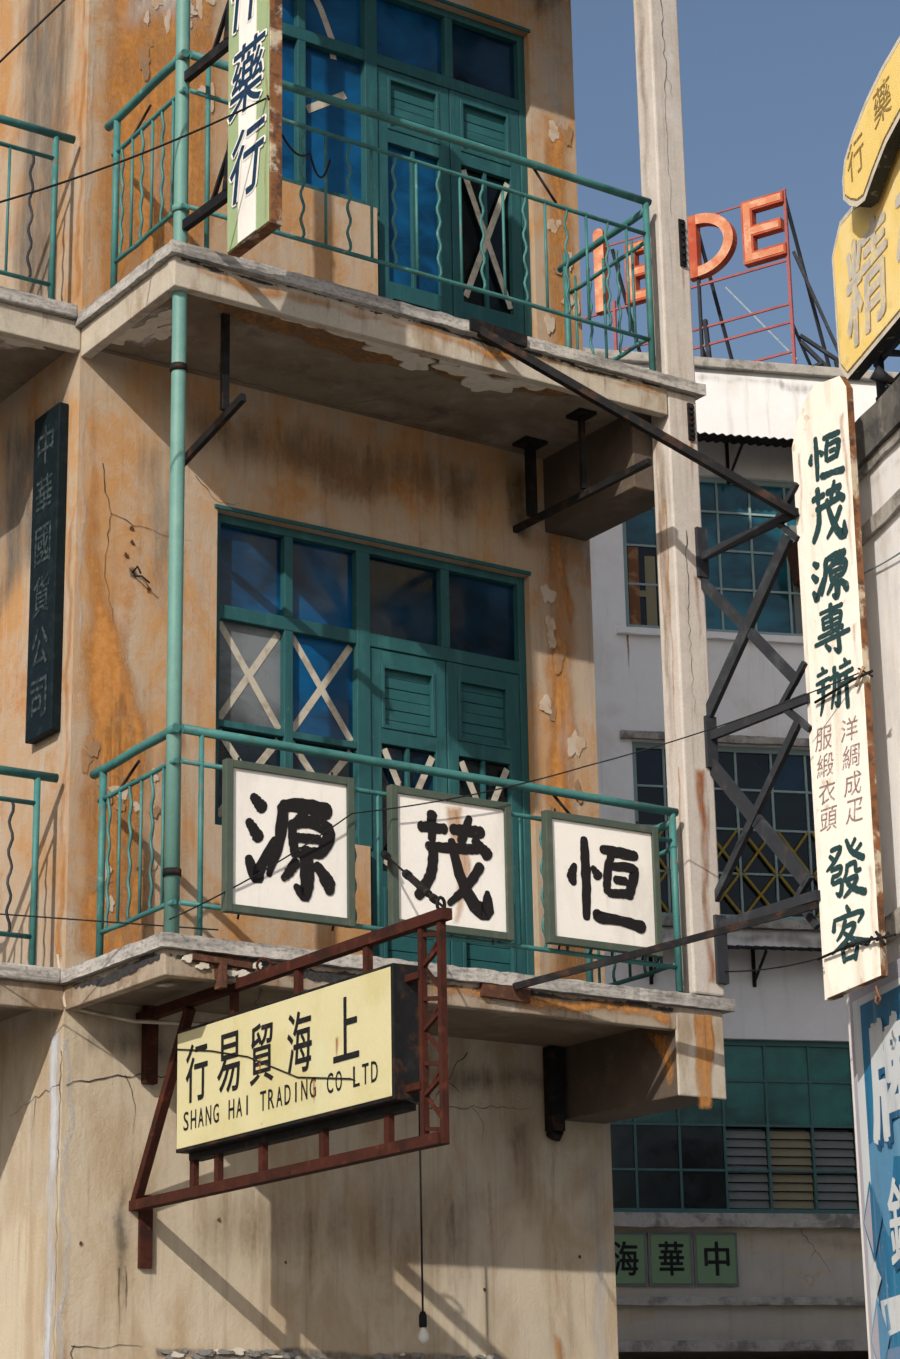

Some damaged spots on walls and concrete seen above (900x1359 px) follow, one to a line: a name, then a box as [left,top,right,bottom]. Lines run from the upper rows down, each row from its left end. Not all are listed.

peeling [136,0,215,81]
peeling [198,82,215,113]
water stain [19,0,64,294]
peeling [215,302,568,396]
peeling [544,296,580,346]
crack [102,463,191,615]
peeling [539,584,564,675]
peeling [539,694,556,722]
peeling [567,730,586,757]
corrosion [694,1015,714,1107]
crack [12,1053,165,1359]
peeling [157,1347,500,1359]